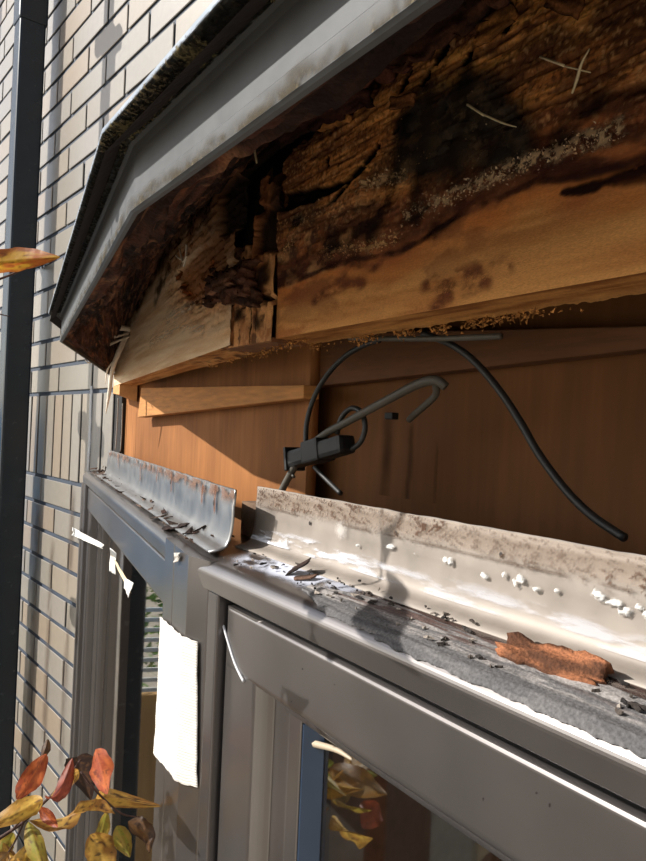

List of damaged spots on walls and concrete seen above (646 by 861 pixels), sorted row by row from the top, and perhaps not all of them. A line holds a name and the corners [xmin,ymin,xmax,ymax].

peeling [543,0,586,21]
damp [256,70,646,299]
peeling [285,557,319,580]
peeling [592,589,646,620]